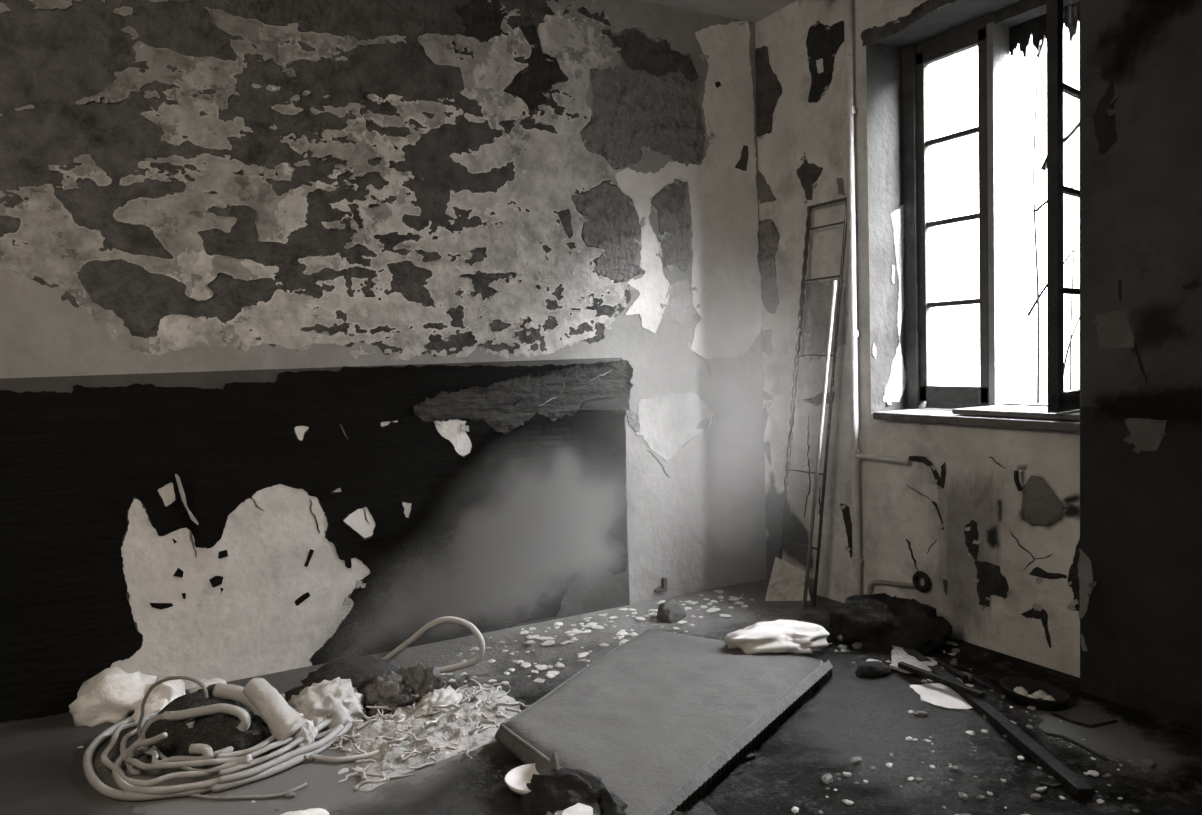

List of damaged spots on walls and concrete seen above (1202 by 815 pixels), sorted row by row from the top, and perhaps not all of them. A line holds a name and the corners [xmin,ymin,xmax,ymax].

flaking render [796,152,823,204]
peeling [837,178,845,196]
peeling [0,0,754,722]
peeling [1123,418,1167,455]
crack [906,539,937,571]
flaking render [964,520,1012,609]
crack [1010,531,1052,571]
flaking render [1028,538,1097,651]
flaking render [1021,603,1051,648]